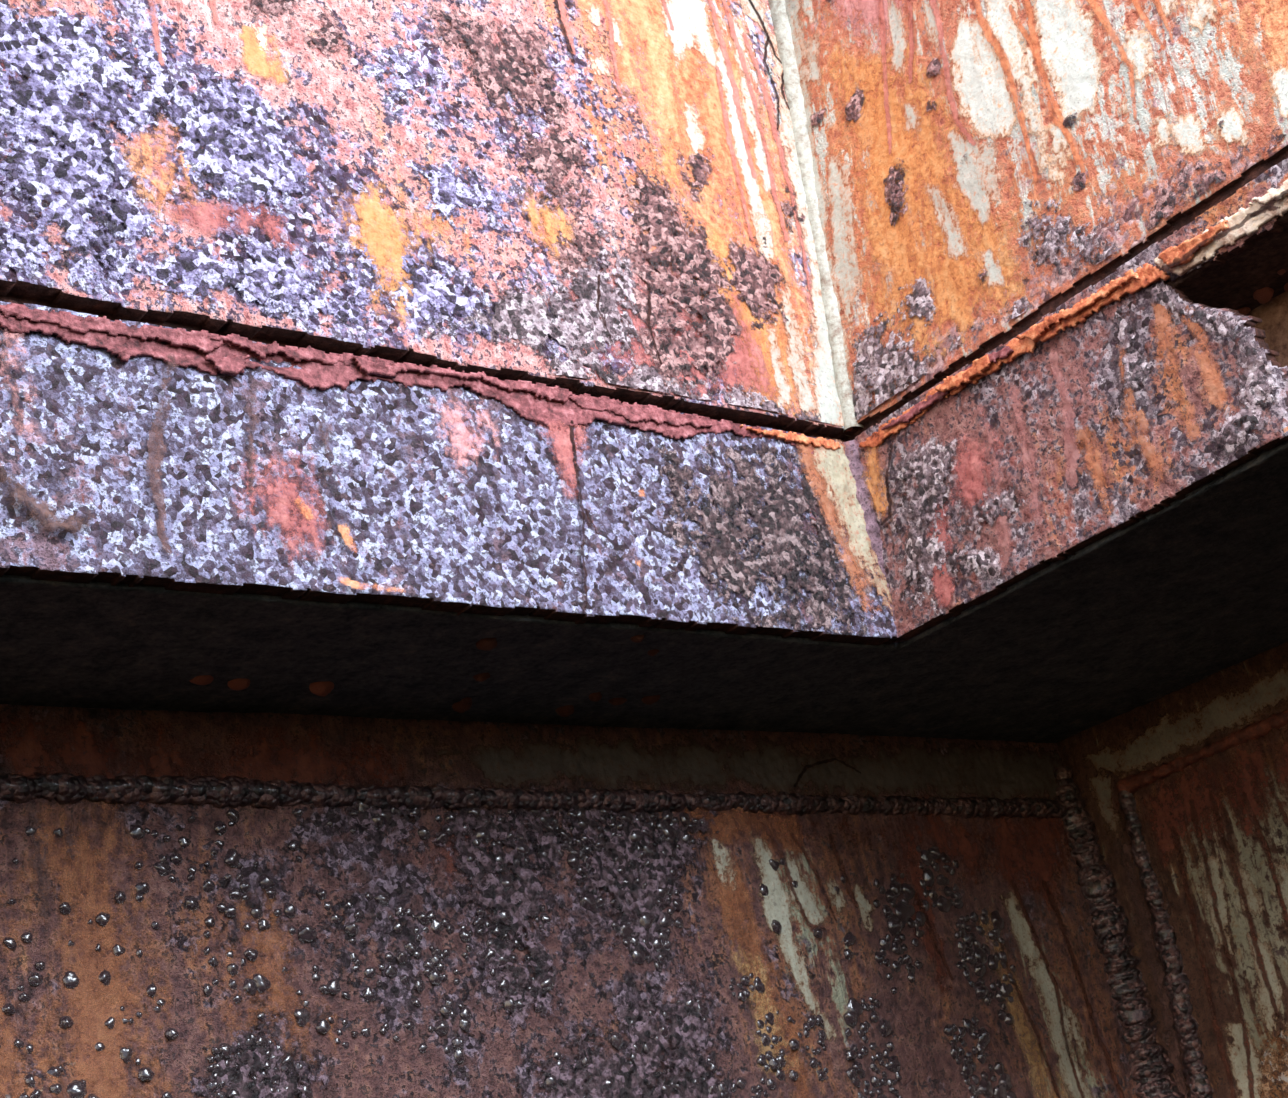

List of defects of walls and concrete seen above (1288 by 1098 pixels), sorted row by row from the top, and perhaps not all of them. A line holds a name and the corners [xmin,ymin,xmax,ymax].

crack [596,274,613,342]
rust [0,0,1288,611]
crack [646,286,662,364]
crack [749,0,790,130]
peeling [923,0,1104,288]
peeling [1150,107,1248,155]
crack [1161,189,1288,272]
rust [0,778,1084,1098]
peeling [749,833,876,1041]
peeling [1000,891,1093,1098]
rust [1042,881,1125,1098]
peeling [1198,852,1284,1098]